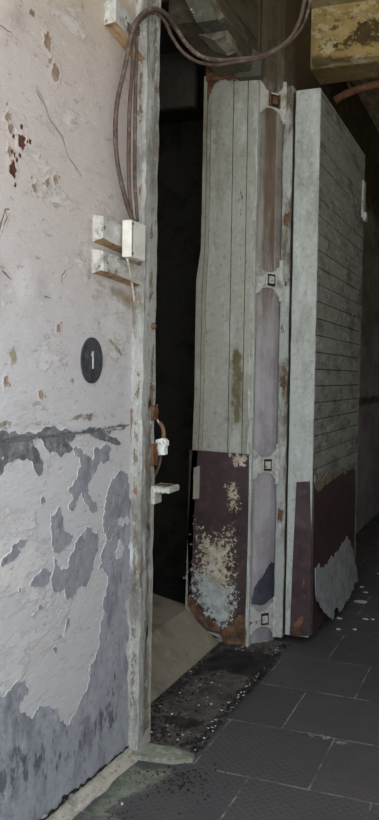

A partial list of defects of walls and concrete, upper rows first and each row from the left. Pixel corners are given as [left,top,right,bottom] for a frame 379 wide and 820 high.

flaking render [2,102,31,188]
crack [36,85,82,176]
peeling [192,482,275,628]
peeling [0,419,153,820]
corrosion [187,597,246,646]